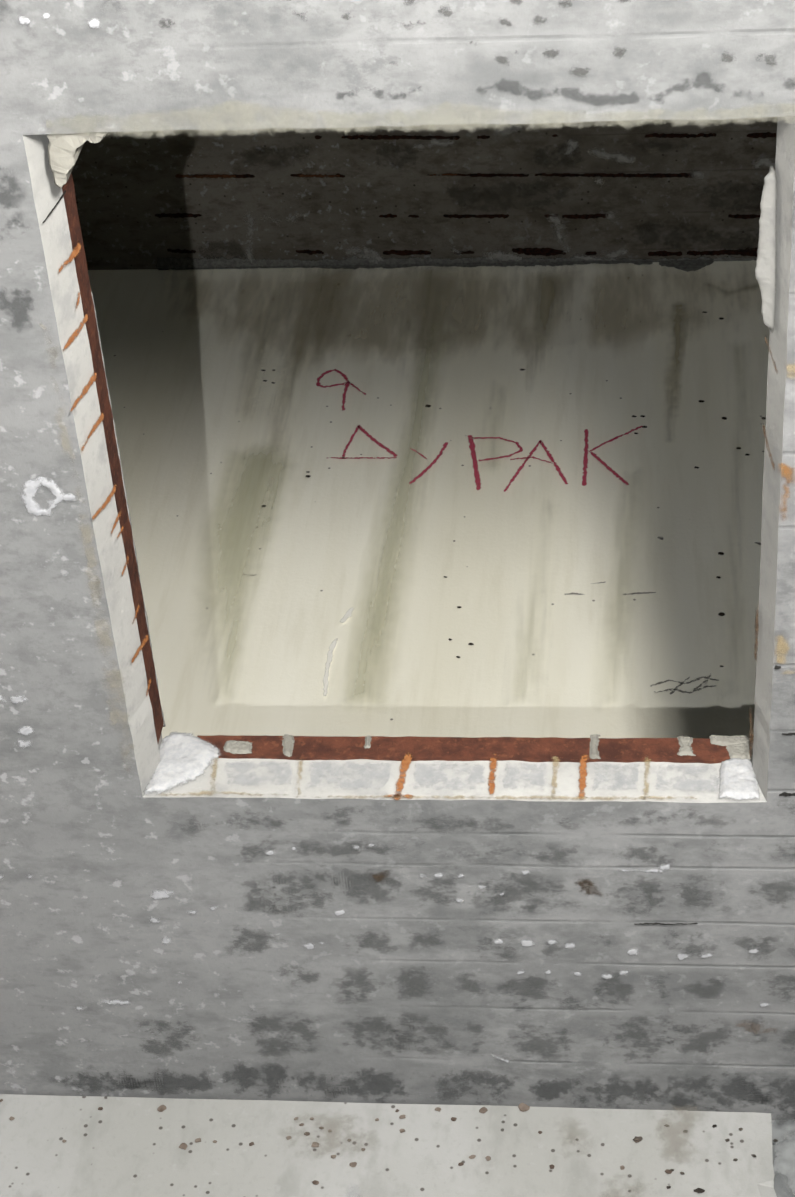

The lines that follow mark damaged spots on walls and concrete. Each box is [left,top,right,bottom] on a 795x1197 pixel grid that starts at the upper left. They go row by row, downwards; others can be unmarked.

rust [59,243,81,273]
spalling [156,256,757,272]
rust [64,292,88,349]
rust [70,372,97,411]
rust [81,413,104,451]
rust [763,425,793,517]
rust [92,485,124,538]
rust [385,753,419,800]
rust [488,754,612,799]